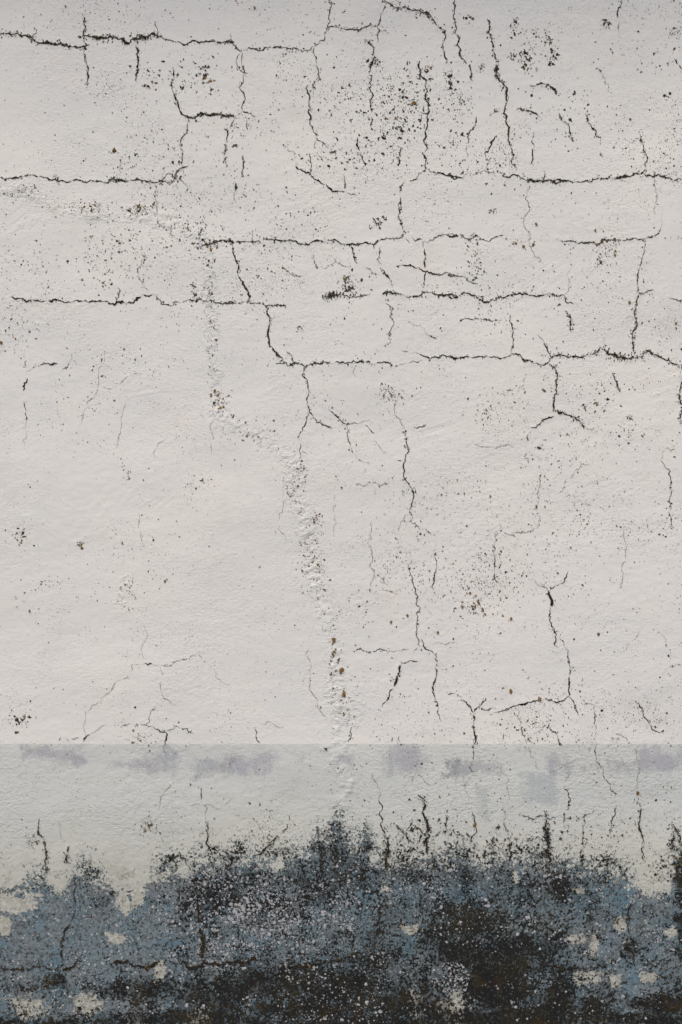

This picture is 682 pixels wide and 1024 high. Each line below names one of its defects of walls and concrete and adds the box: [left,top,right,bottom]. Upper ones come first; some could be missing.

crack [1,0,682,581]
crack [59,630,230,753]
crack [357,524,644,874]
water stain [0,798,682,1024]
crack [671,824,682,873]